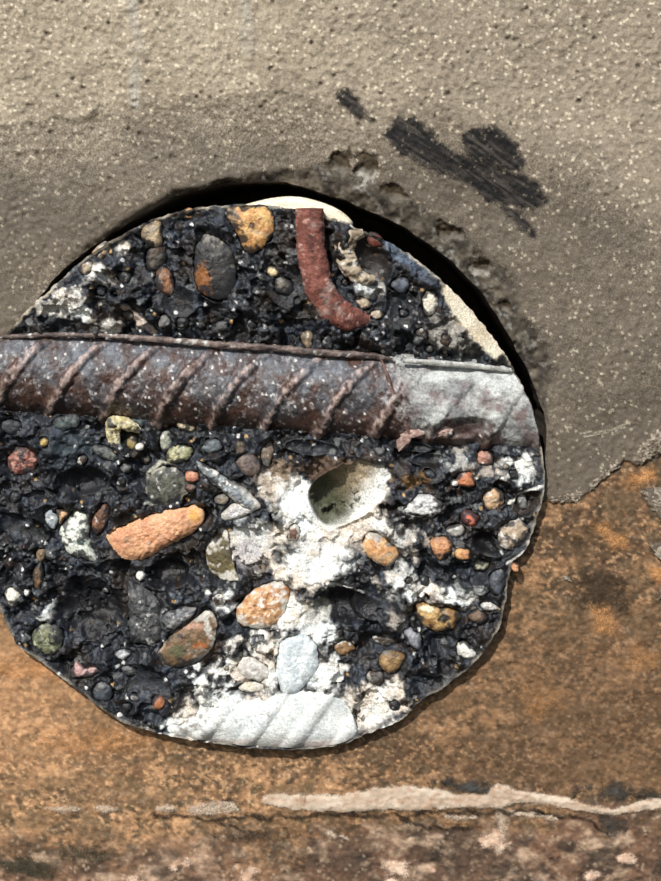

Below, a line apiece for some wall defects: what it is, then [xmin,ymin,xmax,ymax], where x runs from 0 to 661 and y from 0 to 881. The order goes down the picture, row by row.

leakage [0,0,661,503]
spalling [203,147,552,415]
rust [396,419,425,452]
rust [436,426,454,438]
peeling [550,426,661,504]
peeling [640,486,661,512]
leakage [568,570,630,610]
rust [0,457,661,881]